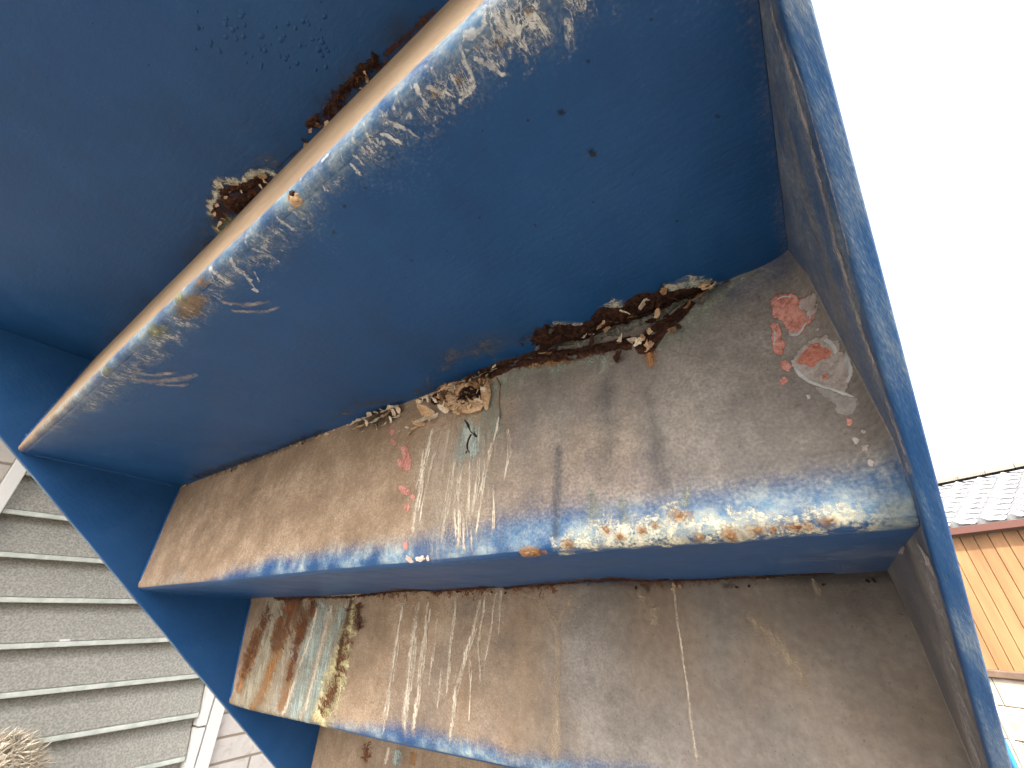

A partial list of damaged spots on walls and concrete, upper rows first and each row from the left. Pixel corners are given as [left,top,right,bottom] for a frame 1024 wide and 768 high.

rust [203,10,434,246]
peeling [181,373,488,487]
peeling [770,292,874,467]
rust [519,485,875,557]
rust [234,573,835,728]